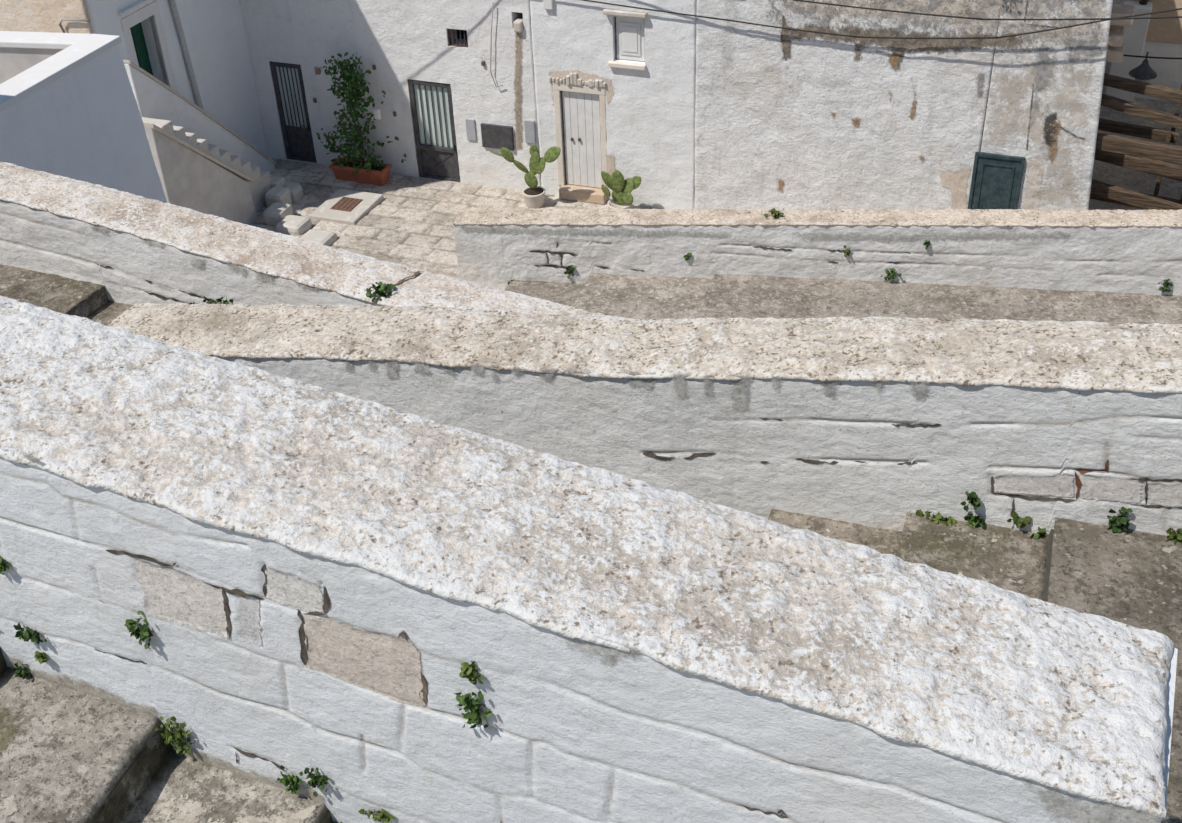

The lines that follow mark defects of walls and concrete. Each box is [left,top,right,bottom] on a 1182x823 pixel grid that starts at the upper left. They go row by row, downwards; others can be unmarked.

peeling [779,0,1024,20]
peeling [995,476,1182,507]
crack [106,550,176,566]
crack [208,564,267,640]
peeling [133,559,425,707]
crack [297,585,330,665]
crack [737,804,788,818]